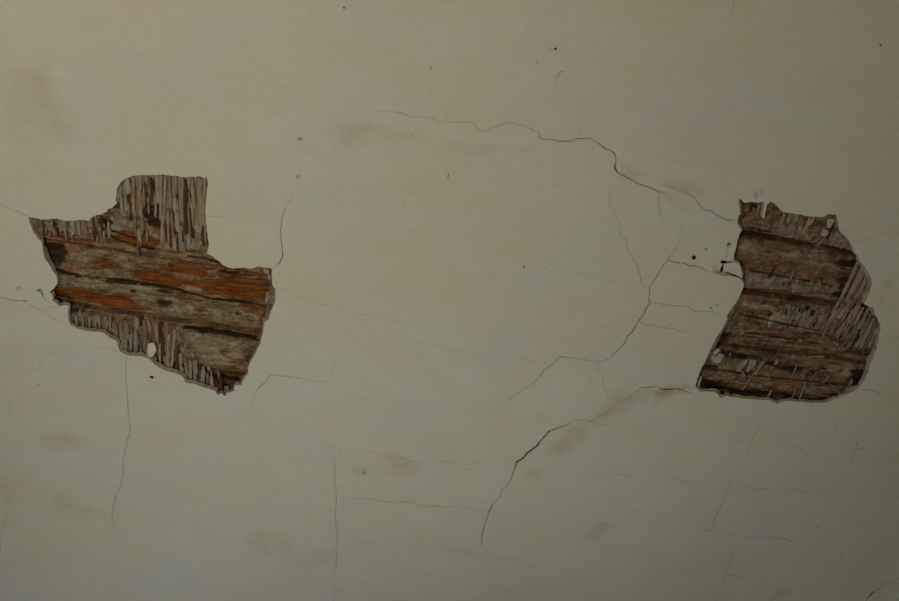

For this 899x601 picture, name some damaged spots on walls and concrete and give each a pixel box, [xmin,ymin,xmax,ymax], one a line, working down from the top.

crack [543,138,657,191]
spalling [29,217,276,396]
crack [614,259,704,354]
spalling [695,199,881,404]
crack [512,423,570,476]